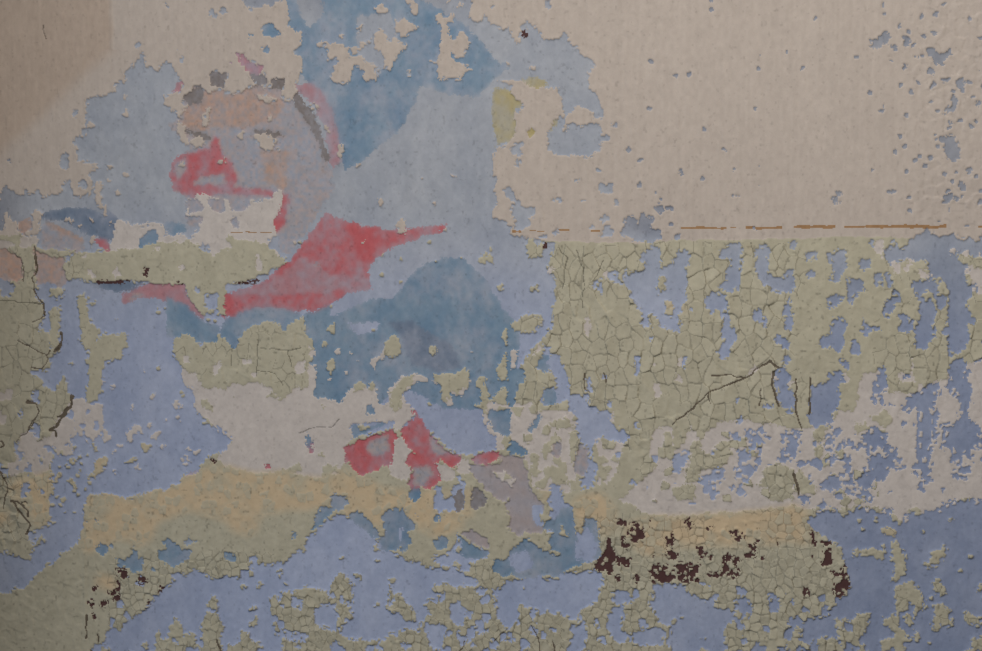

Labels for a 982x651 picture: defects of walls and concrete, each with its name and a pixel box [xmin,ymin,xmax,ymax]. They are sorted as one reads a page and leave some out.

peeling [869,23,982,212]
crack [0,245,86,541]
peeling [0,0,640,594]
peeling [91,221,982,651]
peeling [589,191,693,342]